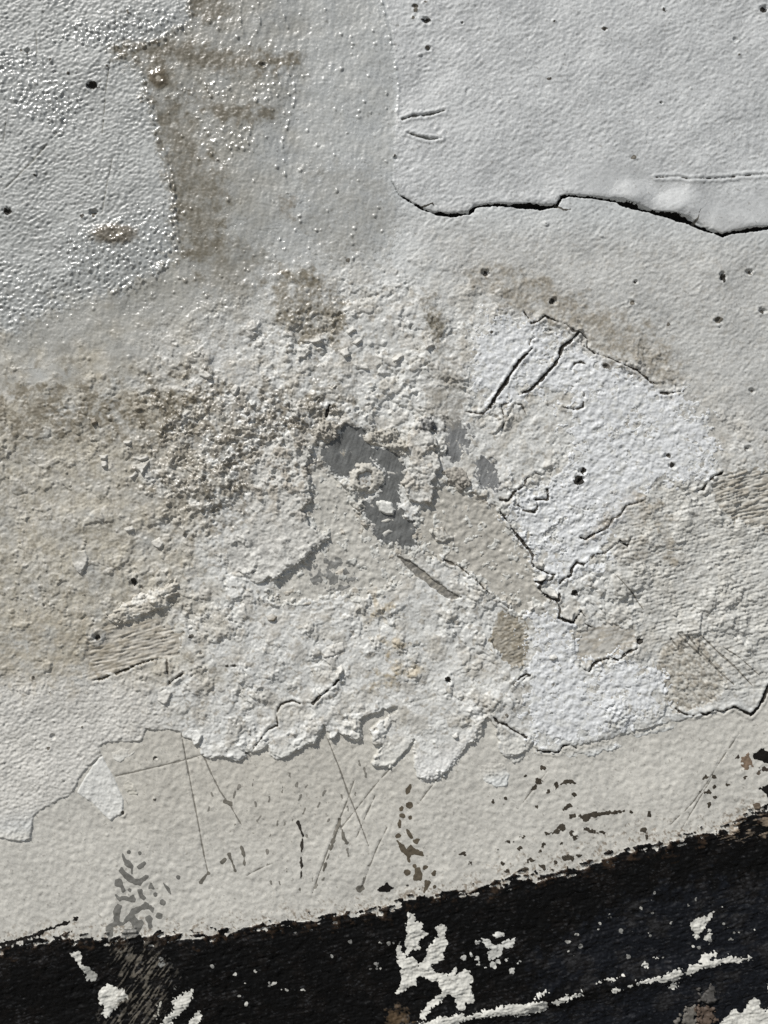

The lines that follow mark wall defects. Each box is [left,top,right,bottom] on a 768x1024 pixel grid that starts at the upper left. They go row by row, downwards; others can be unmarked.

leakage [0,0,418,480]
crack [396,189,768,238]
peeling [338,326,370,370]
crack [488,311,684,429]
peeling [123,440,150,479]
peeling [709,463,768,533]
flaking render [215,407,646,669]
crack [443,559,509,609]
crack [499,488,631,624]
crack [584,648,638,673]
crack [675,685,768,717]
peeling [0,631,768,955]